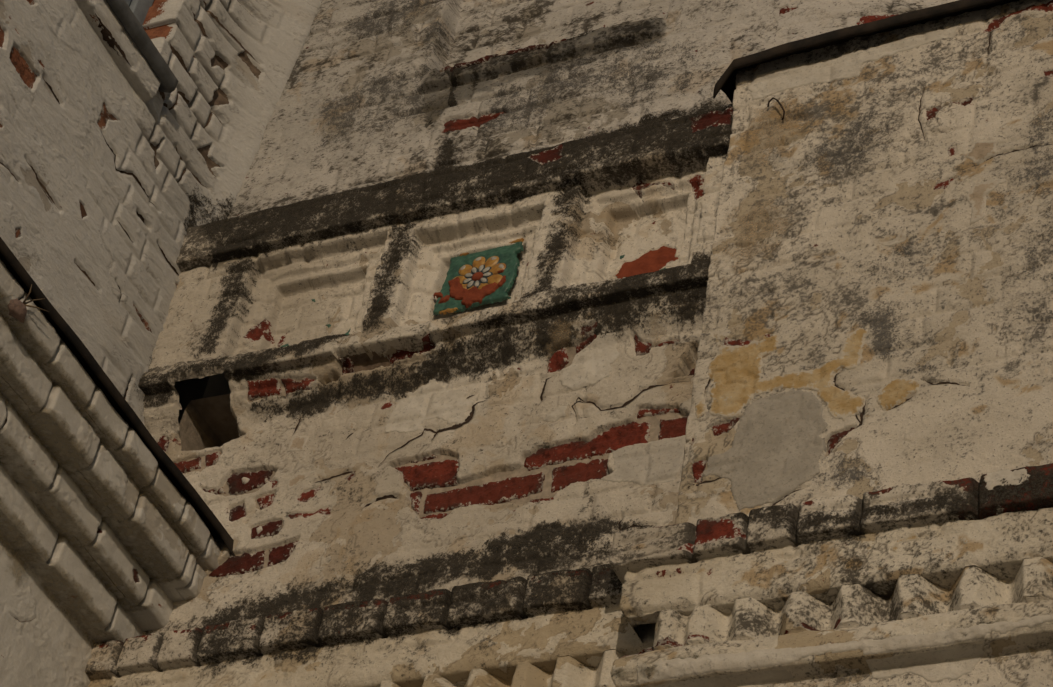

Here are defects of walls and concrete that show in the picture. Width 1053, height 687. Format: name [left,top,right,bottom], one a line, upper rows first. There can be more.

flaking render [0,26,37,89]
damp [135,0,738,422]
flaking render [615,246,679,279]
flaking render [203,469,278,522]
flaking render [209,486,332,577]
crack [315,471,352,483]
crack [361,495,398,511]
crack [380,395,483,464]
flaking render [394,408,694,519]
crack [571,378,711,418]
flaking render [824,428,855,458]
damp [186,513,655,678]